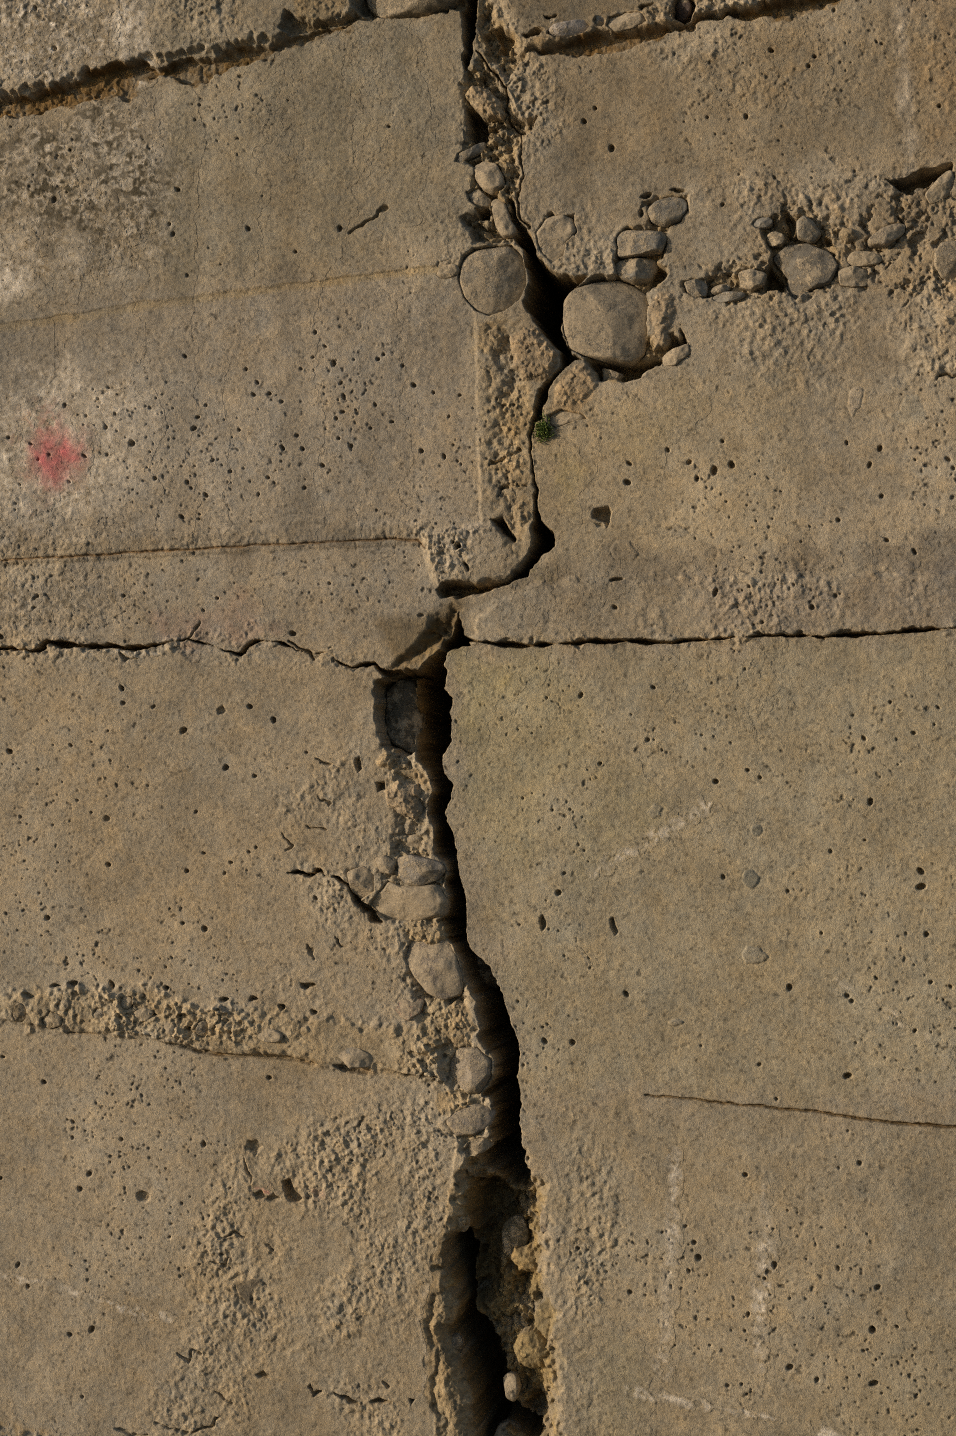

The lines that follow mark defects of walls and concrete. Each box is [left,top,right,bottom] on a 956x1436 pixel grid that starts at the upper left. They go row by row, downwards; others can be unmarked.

flaking render [898,170,956,240]
spalling [436,246,542,576]
crack [186,0,956,1174]
crack [0,639,174,663]
spalling [354,733,477,1024]
spalling [243,1139,304,1204]
spalling [217,1230,246,1241]
spalling [351,1043,569,1436]
spalling [176,1347,204,1365]
crack [450,1226,545,1436]
spalling [114,1391,234,1436]
spalling [308,1380,417,1407]